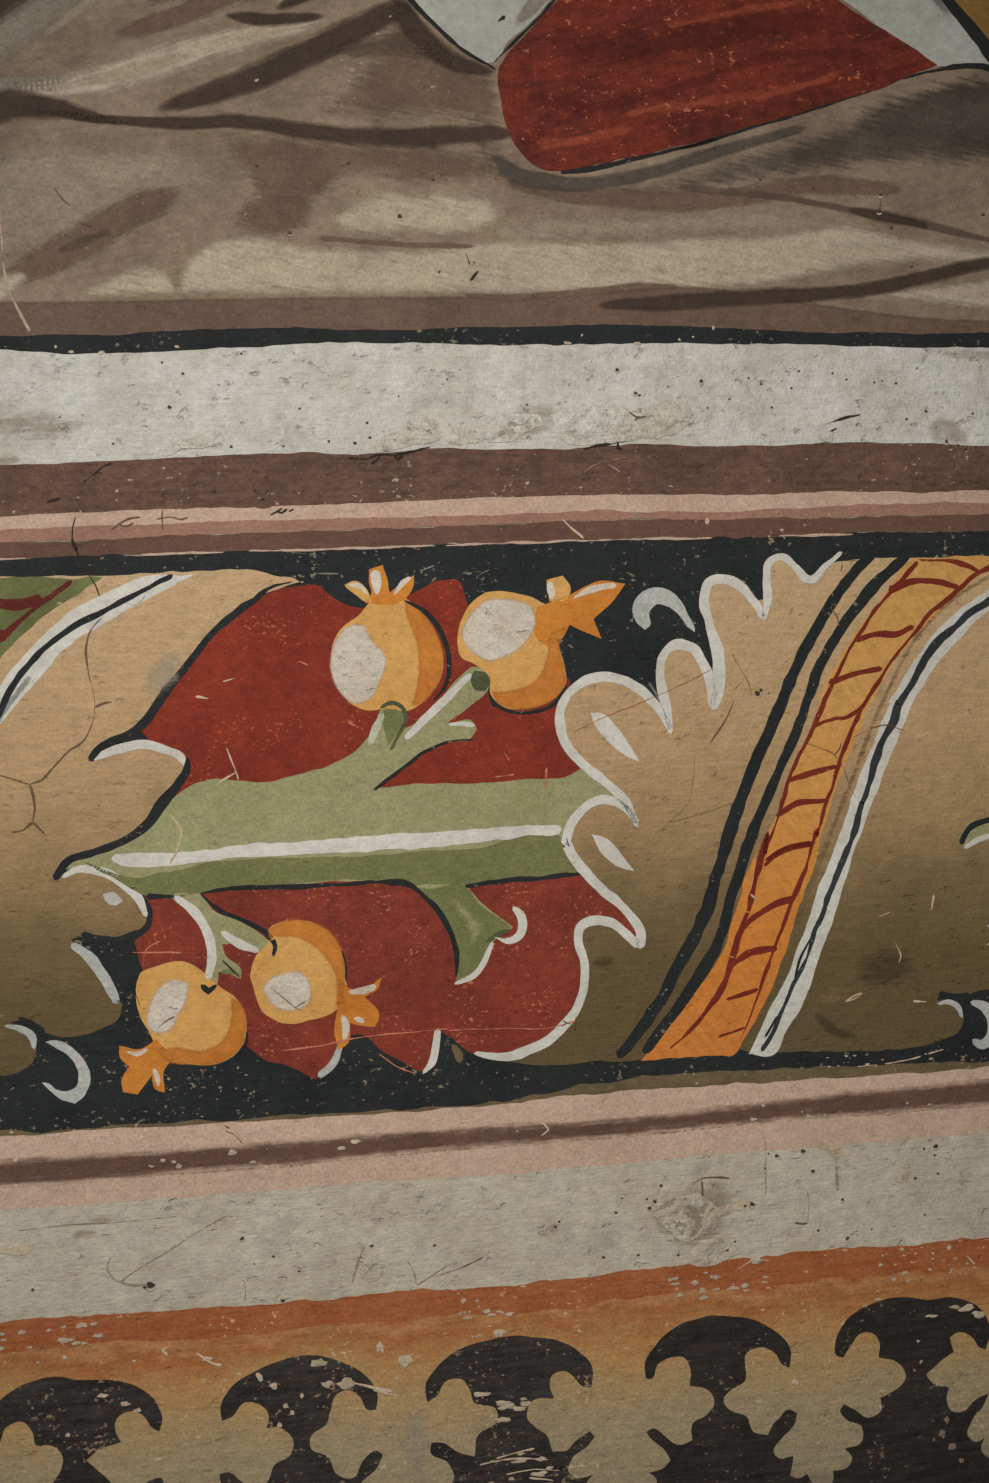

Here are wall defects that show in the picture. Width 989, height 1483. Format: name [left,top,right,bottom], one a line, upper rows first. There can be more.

crack [0,463,188,834]
peeling [474,1392,533,1423]
peeling [489,1452,554,1483]